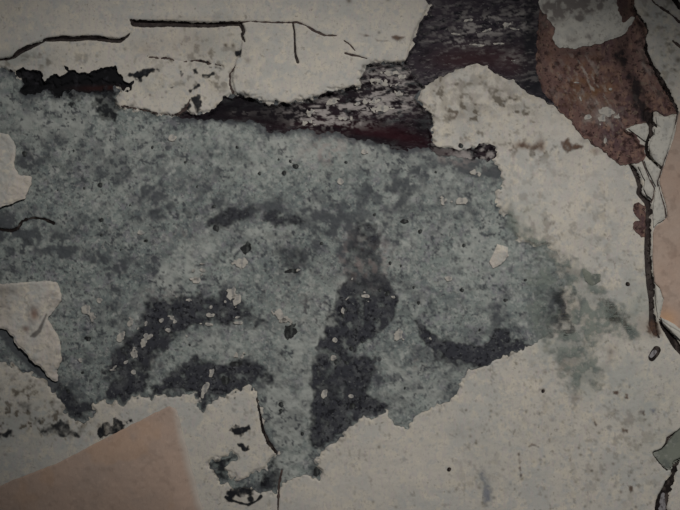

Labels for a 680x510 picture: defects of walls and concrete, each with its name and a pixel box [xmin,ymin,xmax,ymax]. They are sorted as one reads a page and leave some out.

crack [0,19,367,63]
spalling [178,0,677,166]
rust [562,139,582,151]
crack [0,216,55,232]
peeling [0,65,569,494]
peeling [583,268,601,285]
leakage [102,290,273,409]
leakage [310,279,398,448]
leakage [416,320,527,367]
leakage [97,418,132,438]
leakage [230,424,250,451]
crack [256,398,283,510]